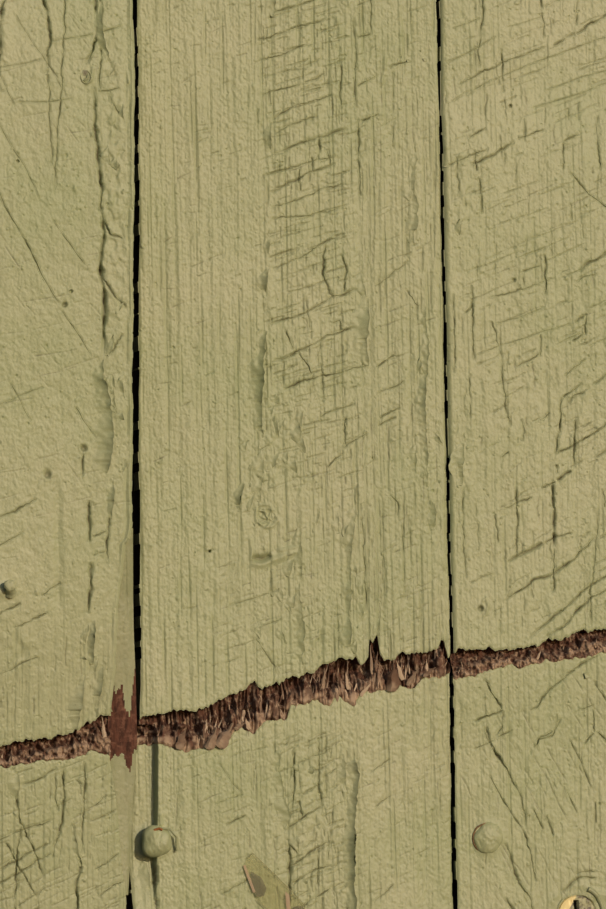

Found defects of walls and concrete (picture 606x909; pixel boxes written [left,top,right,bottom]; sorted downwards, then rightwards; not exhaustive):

peeling [255,269,269,292]
peeling [80,335,127,519]
peeling [232,331,306,512]
crack [0,657,39,676]
crack [0,582,61,628]
peeling [57,621,113,730]
crack [225,619,282,674]
peeling [248,528,305,666]
peeling [331,482,364,654]
peeling [335,749,360,909]